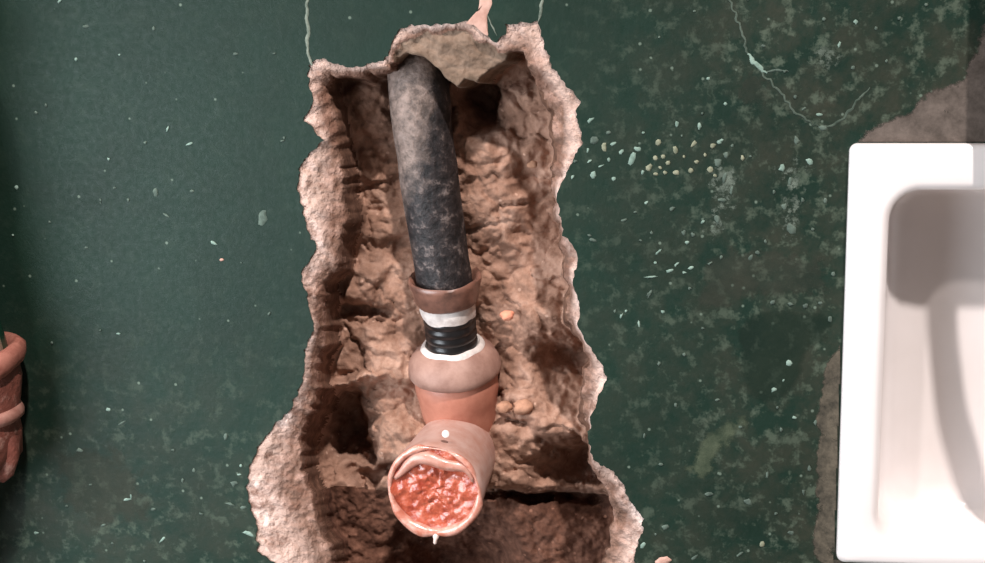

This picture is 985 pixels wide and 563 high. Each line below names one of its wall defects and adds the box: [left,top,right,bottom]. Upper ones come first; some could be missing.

crack [305,0,313,66]
crack [728,0,870,128]
spalling [225,0,752,563]